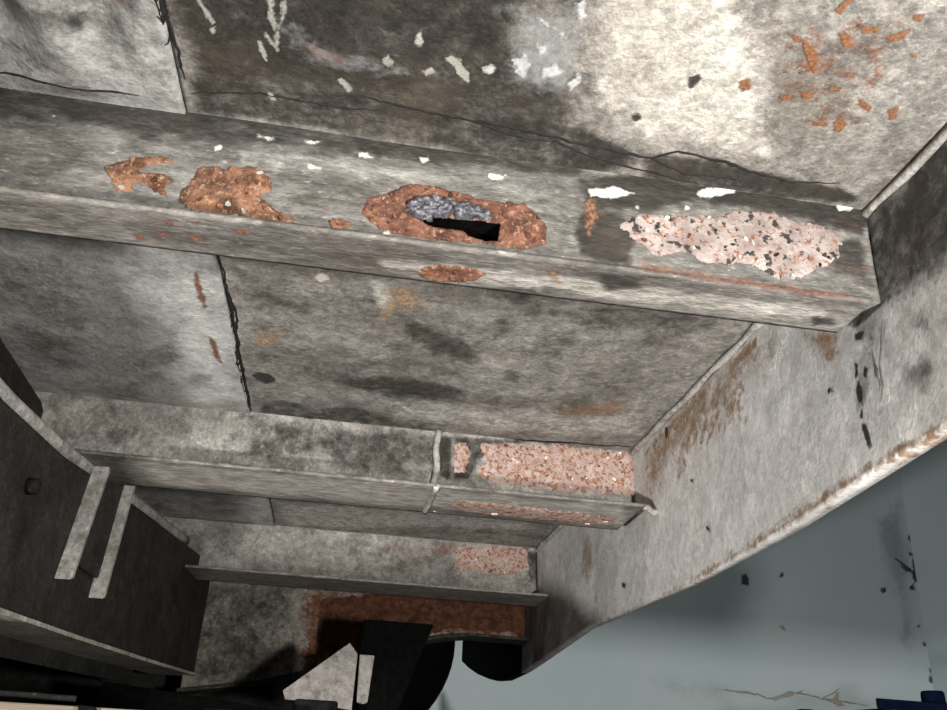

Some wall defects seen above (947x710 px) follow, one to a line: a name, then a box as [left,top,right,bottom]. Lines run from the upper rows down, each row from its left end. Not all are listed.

corrosion [862,14,924,42]
crack [0,72,138,96]
crack [154,0,839,185]
corrosion [739,79,751,92]
corrosion [813,117,847,132]
corrosion [104,156,295,224]
peeling [405,195,493,222]
corrosion [586,200,598,234]
corrosion [418,265,486,283]
corrosion [194,272,206,308]
crack [220,261,252,410]
crack [717,689,868,706]